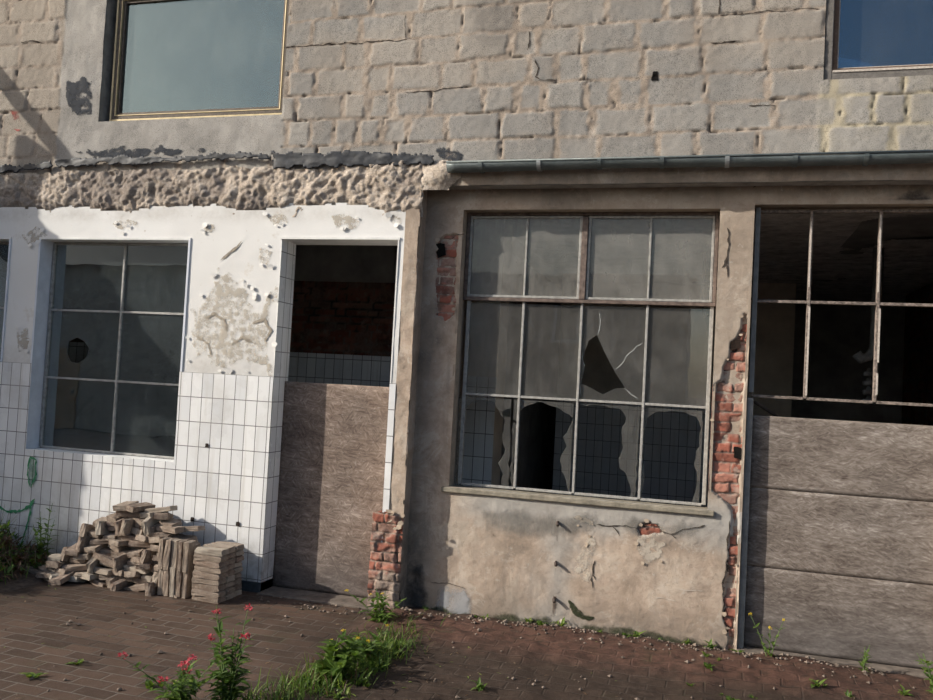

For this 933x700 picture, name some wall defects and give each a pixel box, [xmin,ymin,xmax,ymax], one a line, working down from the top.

peeling [332,216,357,231]
crack [722,228,730,276]
flaking render [433,235,459,321]
peeling [185,272,278,376]
flaking render [708,315,747,650]
crack [596,524,637,536]
crack [662,525,705,538]
leakage [411,566,427,608]
leakage [438,591,469,614]
crack [722,521,730,633]